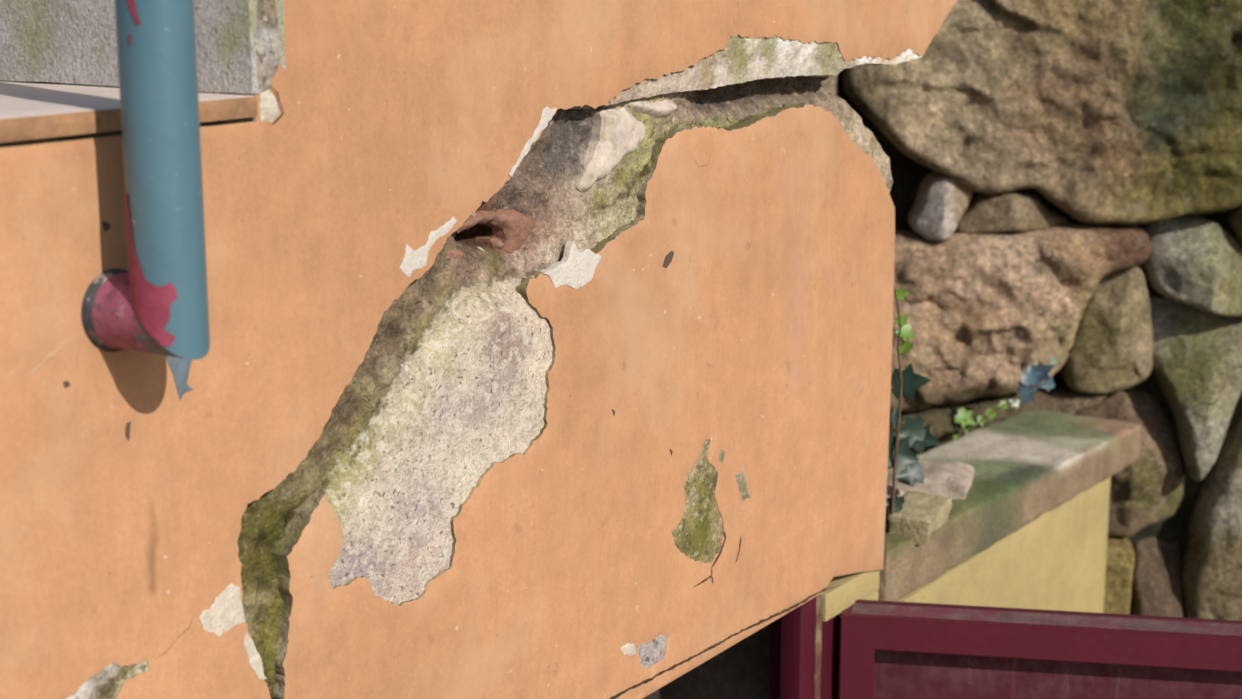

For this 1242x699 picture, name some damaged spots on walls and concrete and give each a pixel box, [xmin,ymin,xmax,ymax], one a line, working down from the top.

peeling [256,0,283,123]
crack [199,35,922,699]
peeling [671,439,742,587]
peeling [736,470,751,500]
spalling [67,660,148,699]
spalling [621,634,667,669]